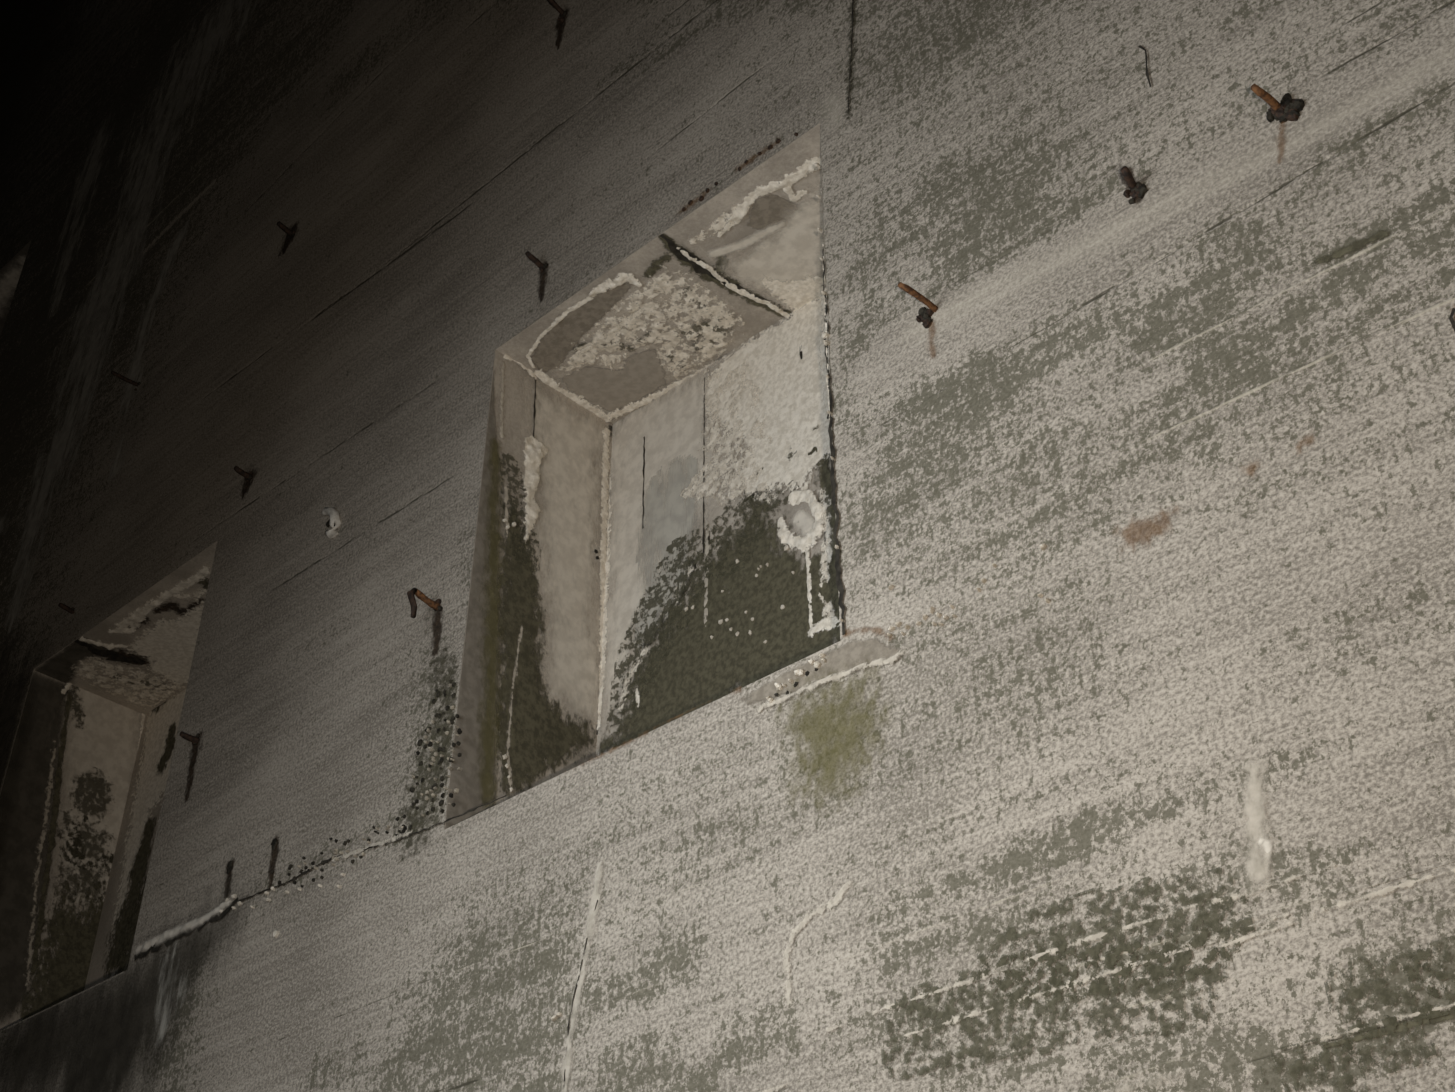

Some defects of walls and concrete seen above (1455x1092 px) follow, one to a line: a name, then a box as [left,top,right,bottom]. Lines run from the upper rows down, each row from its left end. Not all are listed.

crack [844,0,858,120]
damp [500,156,840,730]
damp [23,564,211,990]
damp [502,627,523,792]
damp [0,916,225,1092]